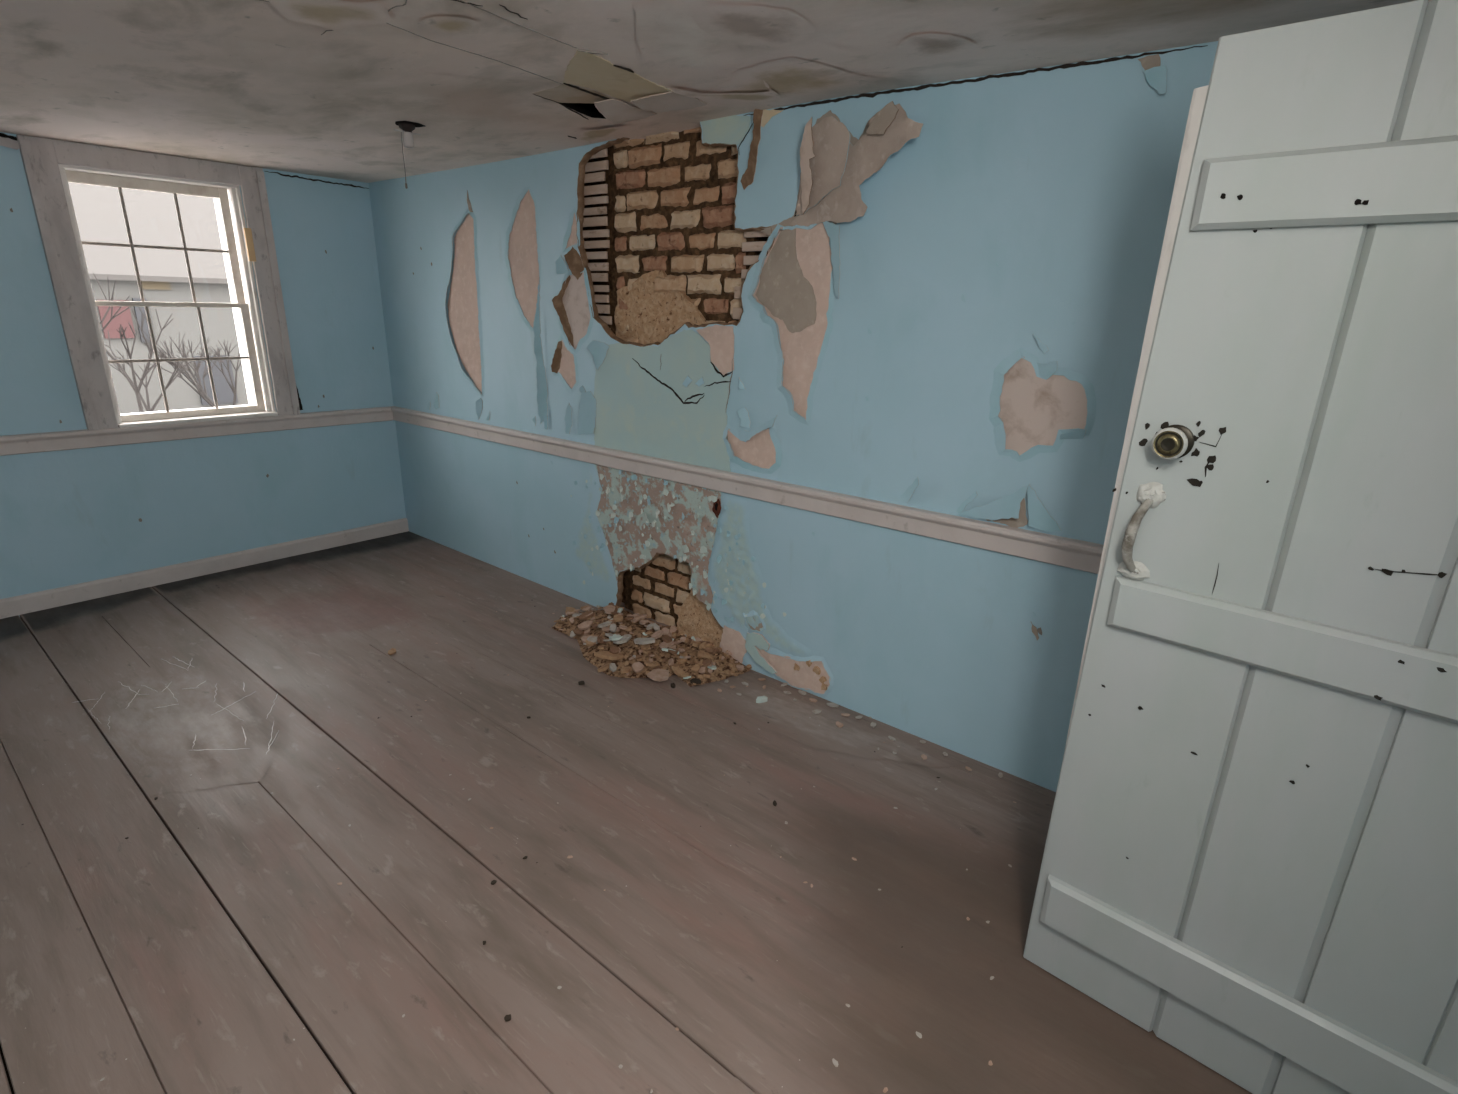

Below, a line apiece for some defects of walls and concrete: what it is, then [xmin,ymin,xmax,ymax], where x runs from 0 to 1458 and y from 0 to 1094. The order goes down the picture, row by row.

crack [387,0,576,84]
flaking render [815,104,888,146]
crack [744,45,1208,116]
flaking render [448,213,490,421]
flaking render [508,190,539,327]
flaking render [558,109,837,472]
flaking render [999,358,1087,455]
peeling [1139,422,1169,446]
peeling [594,464,834,697]